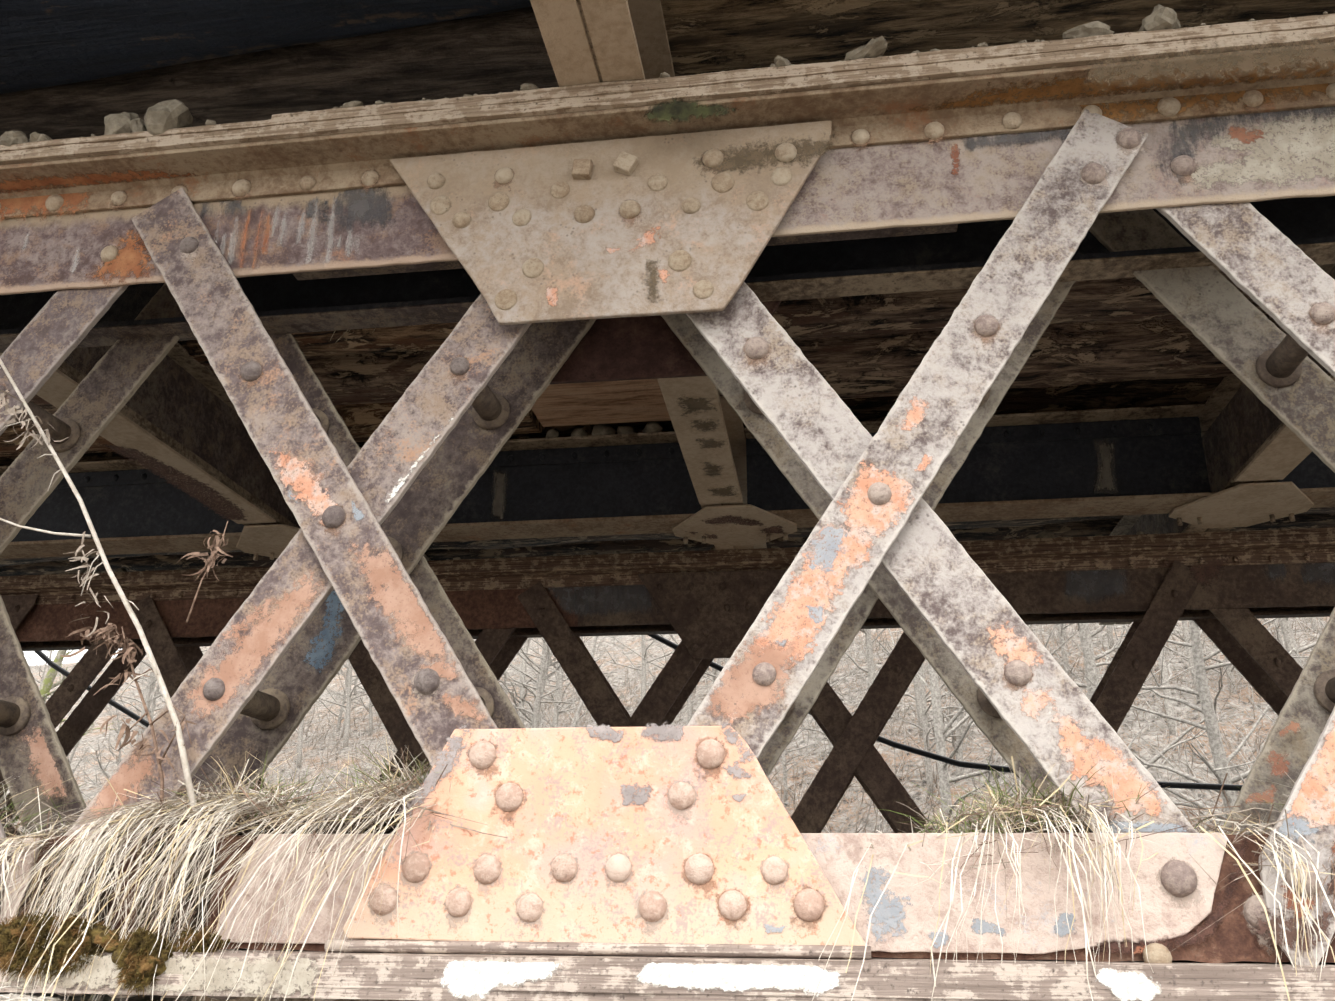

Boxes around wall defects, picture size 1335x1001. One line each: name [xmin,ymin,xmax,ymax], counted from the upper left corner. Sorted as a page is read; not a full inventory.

corrosion [911,48,1335,144]
corrosion [950,144,960,175]
corrosion [0,169,196,220]
corrosion [86,230,154,286]
peeling [861,866,911,941]